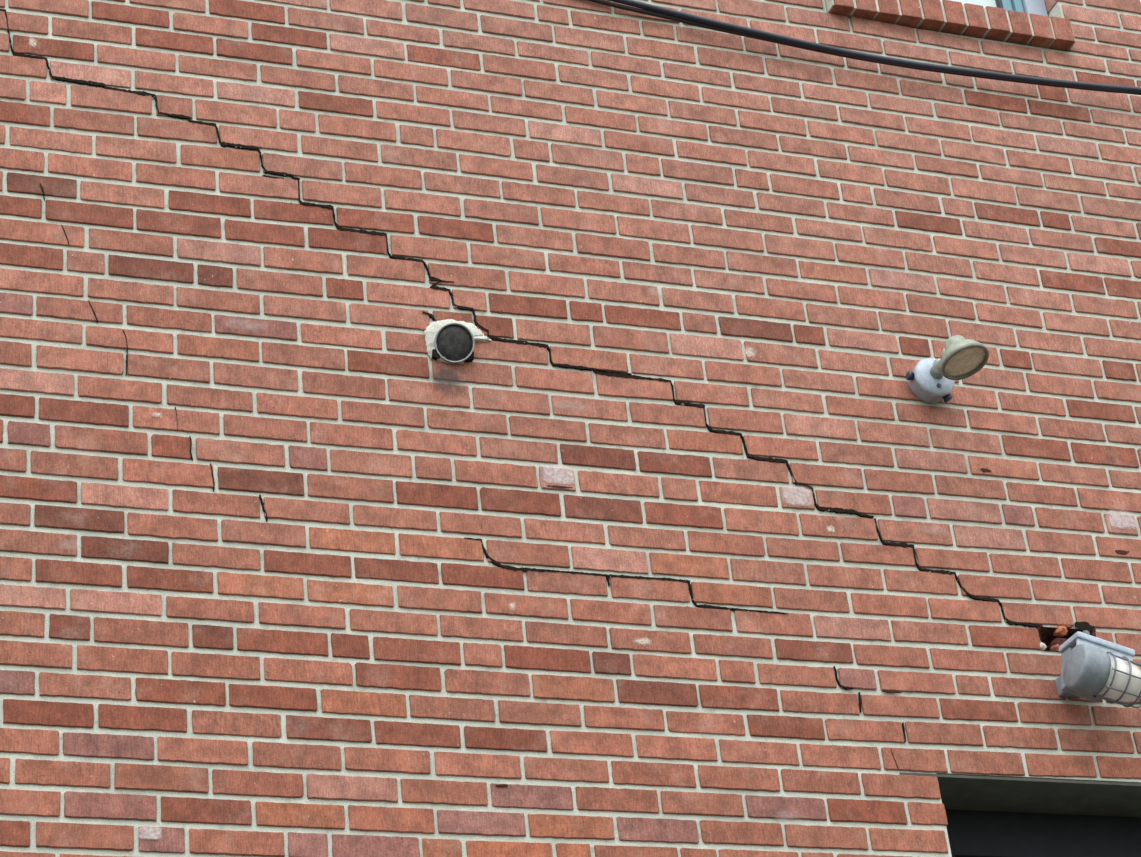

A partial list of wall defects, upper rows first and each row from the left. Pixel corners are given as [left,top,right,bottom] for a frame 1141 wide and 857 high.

crack [0,9,1042,628]